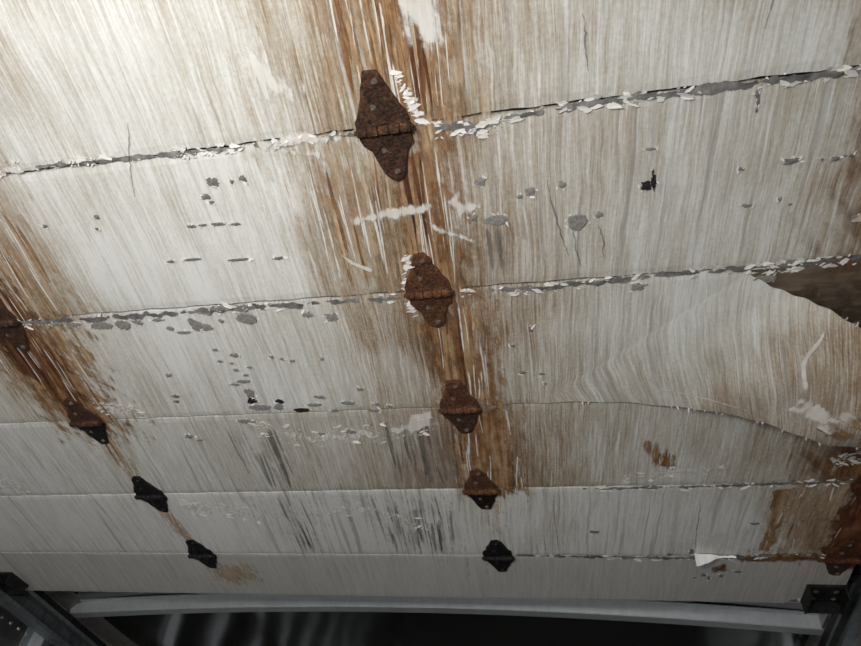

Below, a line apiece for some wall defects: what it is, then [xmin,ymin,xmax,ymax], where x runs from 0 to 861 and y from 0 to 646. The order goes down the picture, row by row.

peeling [398,0,444,51]
peeling [389,70,544,139]
peeling [555,64,861,113]
peeling [0,131,354,178]
peeling [198,175,248,205]
peeling [354,204,431,225]
peeling [448,194,509,227]
corrosion [302,0,529,534]
corrosion [0,244,154,478]
peeling [212,348,433,447]
corrosion [644,441,676,470]
corrosion [736,413,861,562]